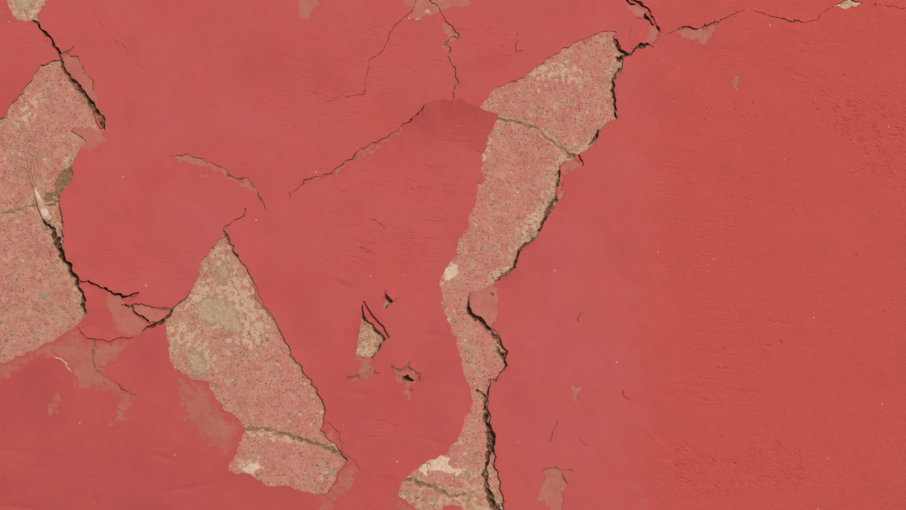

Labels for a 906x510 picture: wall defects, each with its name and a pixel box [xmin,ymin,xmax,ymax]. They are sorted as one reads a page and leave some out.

spalling [7,0,48,21]
crack [31,19,106,130]
crack [327,0,459,102]
crack [289,112,419,197]
spalling [0,60,136,427]
spalling [398,0,651,510]
crack [403,0,904,510]
spalling [166,235,359,510]
peeling [347,301,389,383]
peeling [390,361,421,403]